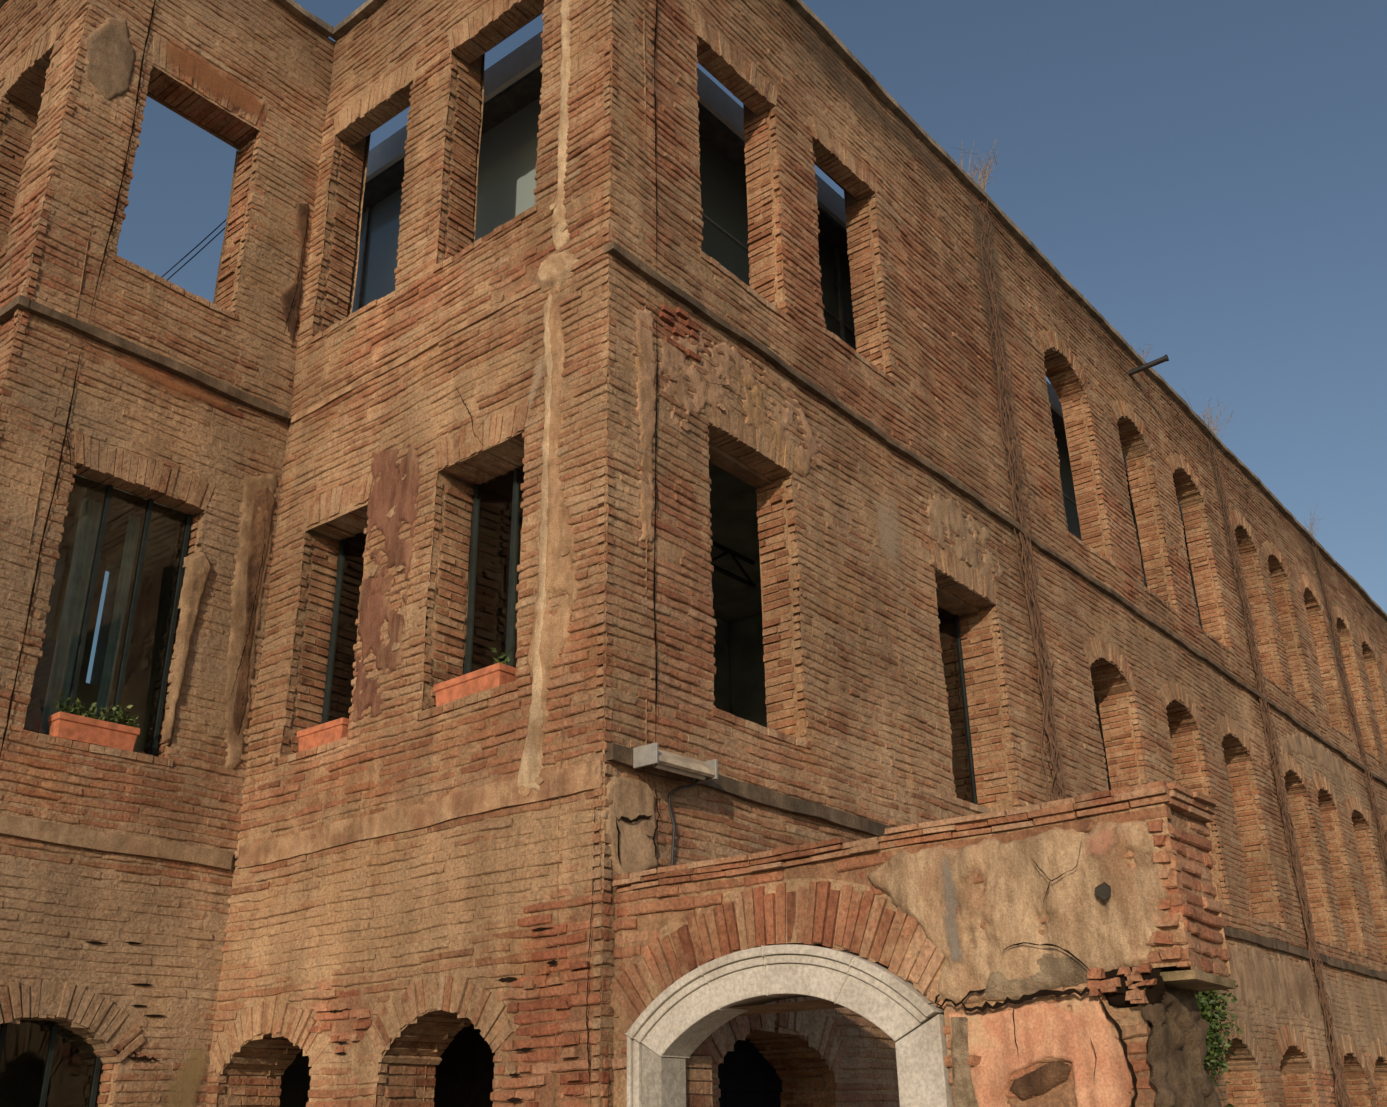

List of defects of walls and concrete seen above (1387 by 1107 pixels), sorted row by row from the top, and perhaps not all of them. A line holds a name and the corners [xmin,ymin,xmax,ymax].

crack [652,2,660,262]
spalling [659,304,702,363]
crack [0,0,156,757]
crack [653,319,747,743]
peeling [352,444,420,722]
crack [1028,839,1082,902]
crack [586,776,660,1107]
spalling [496,960,591,1009]
spalling [496,1047,547,1107]
spalling [560,1036,585,1096]
peeling [1010,1061,1072,1101]